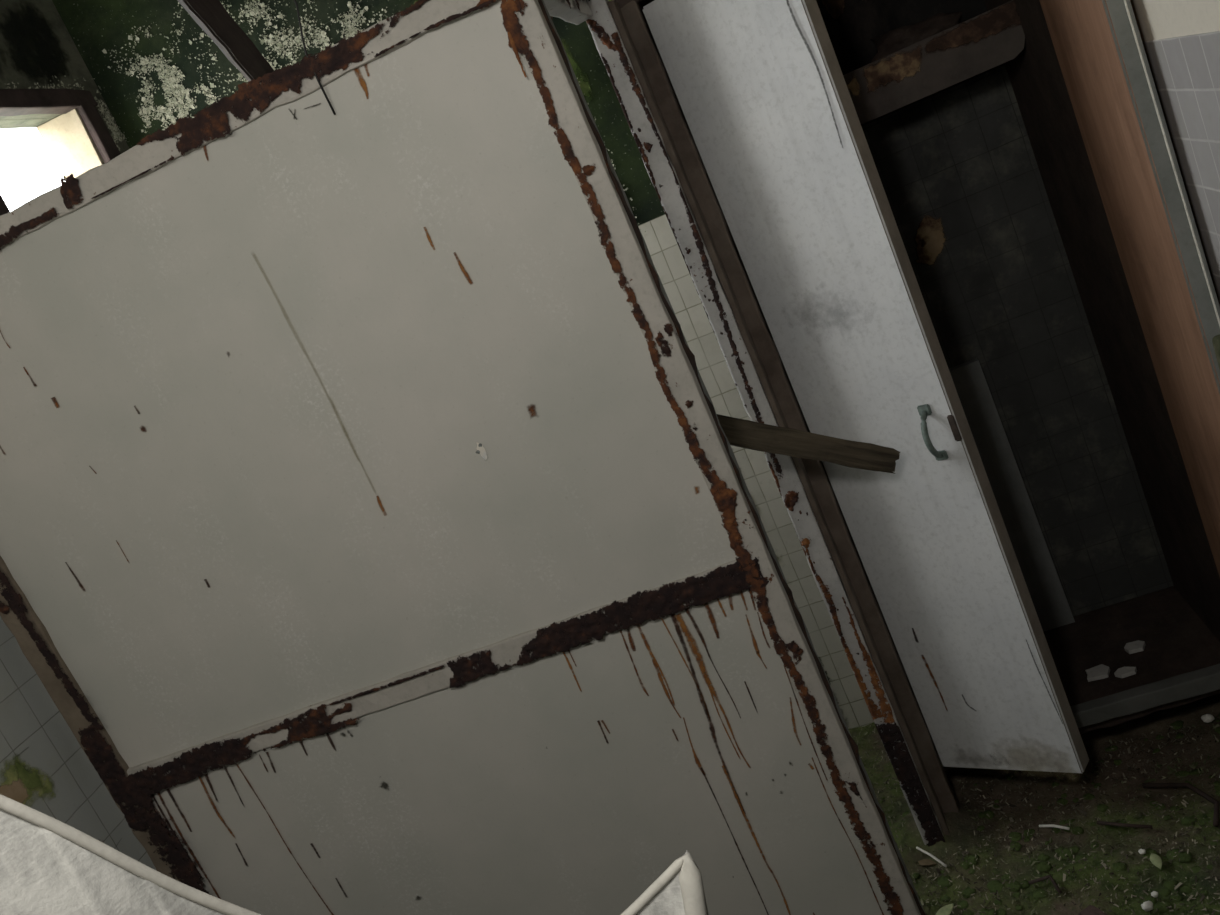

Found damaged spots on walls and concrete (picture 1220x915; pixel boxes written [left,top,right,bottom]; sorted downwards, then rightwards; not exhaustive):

peeling [102,3,248,133]
peeling [221,0,393,71]
corrosion [0,0,903,915]
corrosion [798,538,948,847]